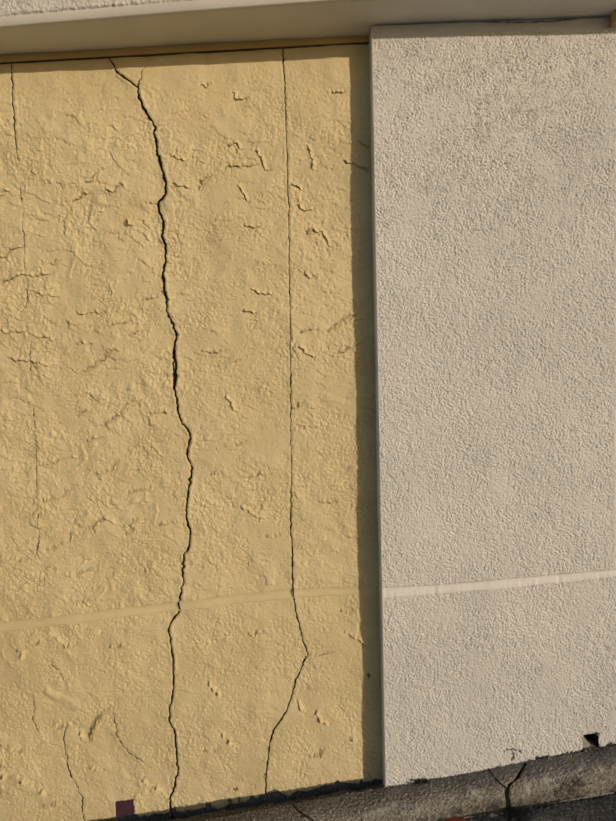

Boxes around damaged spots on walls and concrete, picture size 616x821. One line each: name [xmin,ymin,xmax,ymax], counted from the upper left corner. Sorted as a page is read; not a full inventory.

crack [109,59,193,813]
crack [264,49,328,794]
crack [63,727,85,820]
crack [488,763,527,821]
spalling [535,742,616,760]